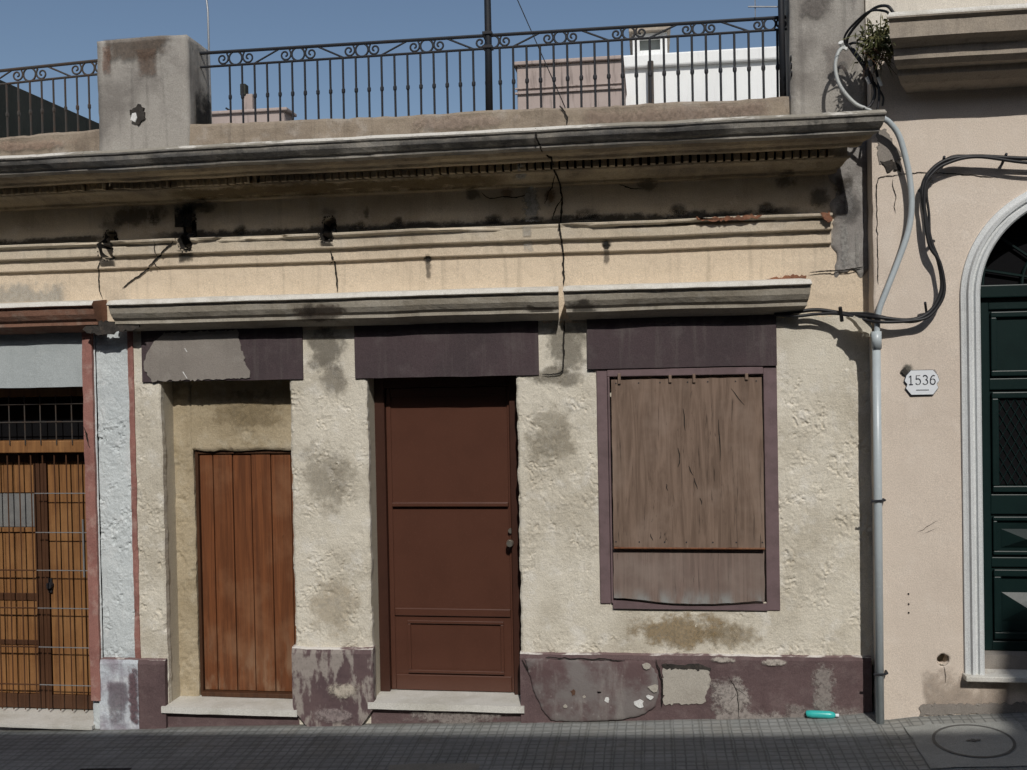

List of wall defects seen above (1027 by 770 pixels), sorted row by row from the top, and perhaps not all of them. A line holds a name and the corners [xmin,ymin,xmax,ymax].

damp [169,168,784,239]
crack [481,128,565,285]
hole [97,229,118,267]
crack [97,240,173,299]
hole [175,214,197,261]
crack [329,251,338,292]
flaking render [144,329,251,382]
crack [542,320,565,375]
peeling [108,669,139,723]
peeling [315,684,355,722]
peeling [634,657,856,720]